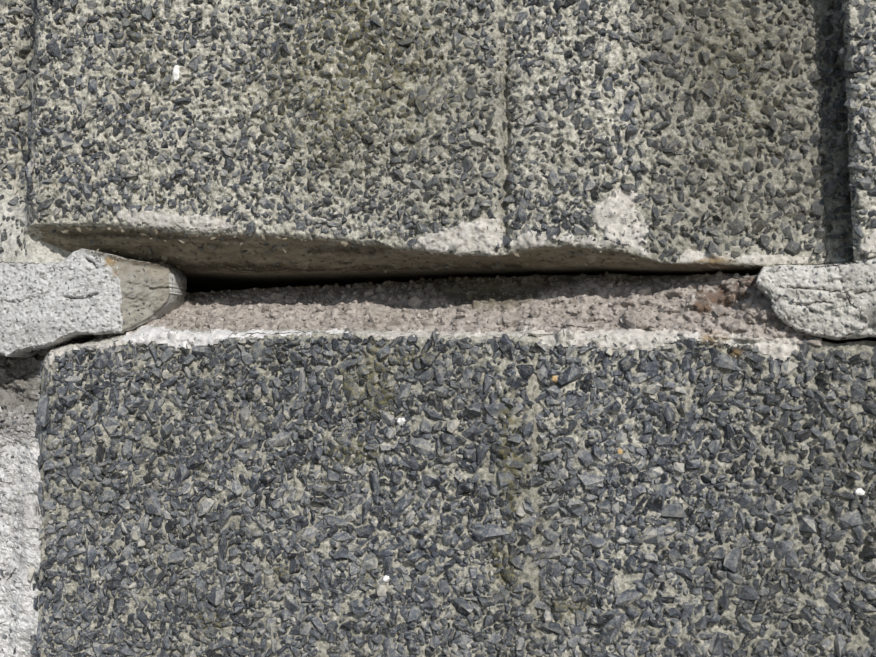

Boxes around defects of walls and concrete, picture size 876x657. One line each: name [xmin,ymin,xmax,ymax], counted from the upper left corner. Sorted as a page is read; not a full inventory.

spalling [0,187,846,657]